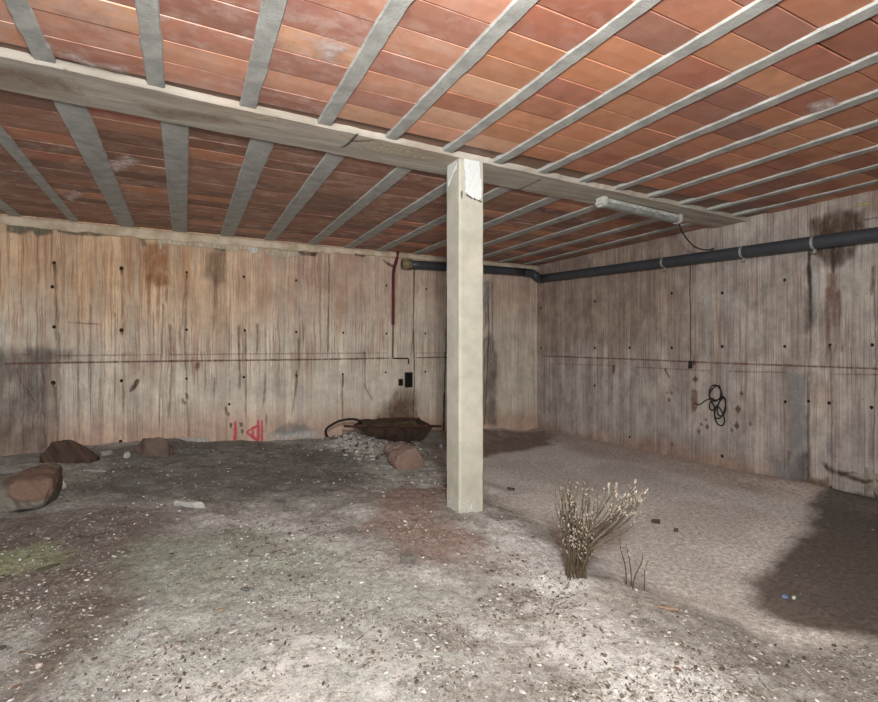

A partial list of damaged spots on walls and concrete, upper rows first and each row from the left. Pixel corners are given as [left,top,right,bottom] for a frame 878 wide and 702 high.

flaking render [447,159,482,202]
leakage [811,212,863,235]